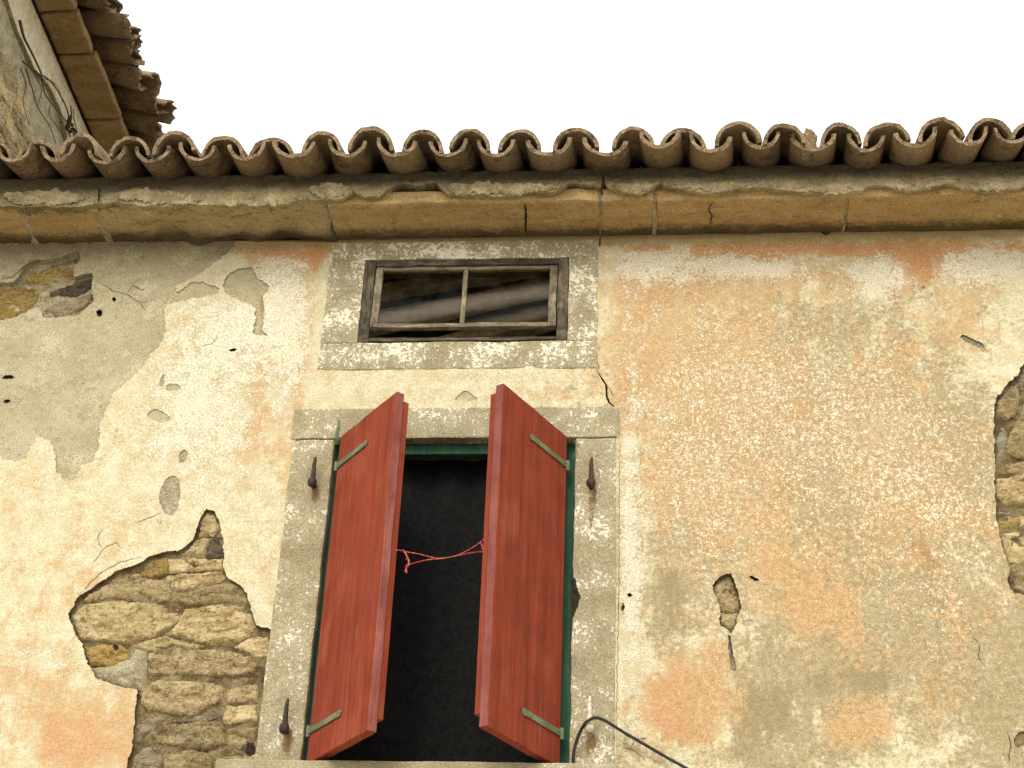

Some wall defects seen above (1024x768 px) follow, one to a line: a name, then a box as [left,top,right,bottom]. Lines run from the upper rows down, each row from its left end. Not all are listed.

peeling [0,241,269,480]
crack [597,362,614,406]
flaking render [993,365,1024,595]
flaking render [68,508,271,768]
flaking render [712,573,754,671]